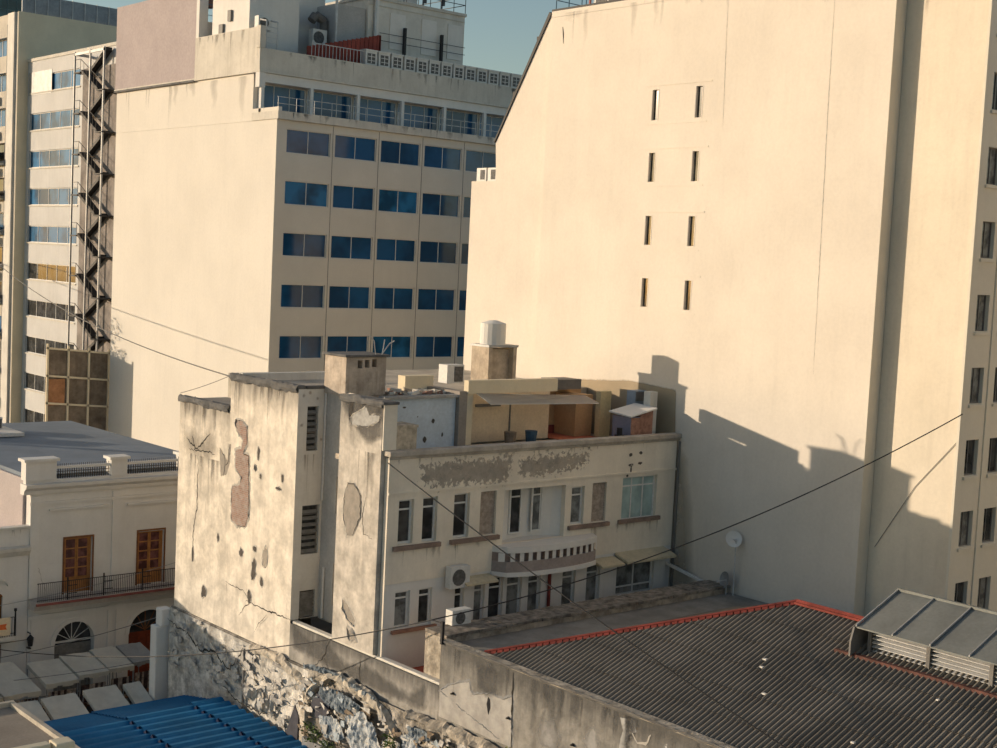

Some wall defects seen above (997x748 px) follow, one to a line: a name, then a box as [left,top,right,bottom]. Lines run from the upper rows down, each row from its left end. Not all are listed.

peeling [349,406,381,428]
crack [187,434,215,548]
spalling [220,418,262,529]
spalling [343,481,362,538]
peeling [417,450,589,489]